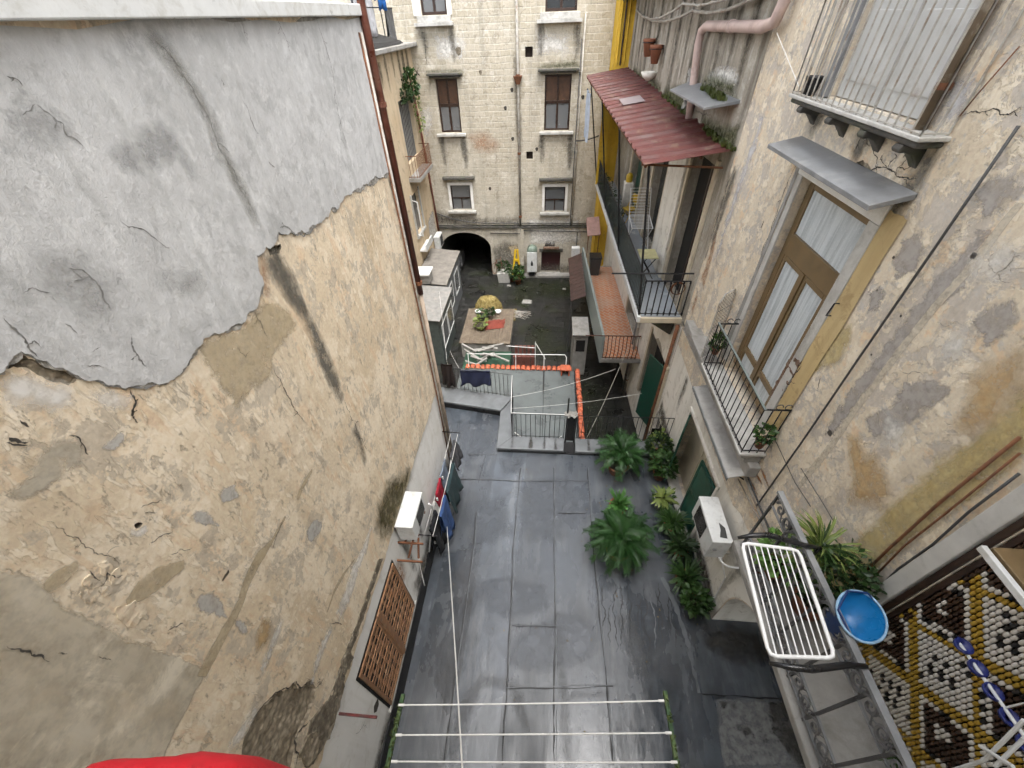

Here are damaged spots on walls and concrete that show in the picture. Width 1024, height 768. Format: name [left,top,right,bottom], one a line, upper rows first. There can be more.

crack [7,76,83,146]
crack [964,107,1020,117]
crack [856,128,911,186]
spalling [331,173,389,213]
spalling [257,225,316,268]
crack [70,268,111,310]
crack [66,324,156,423]
flaking render [0,286,296,405]
damp [267,250,339,394]
crack [47,521,122,585]
crack [7,647,67,662]
spalling [242,558,383,768]